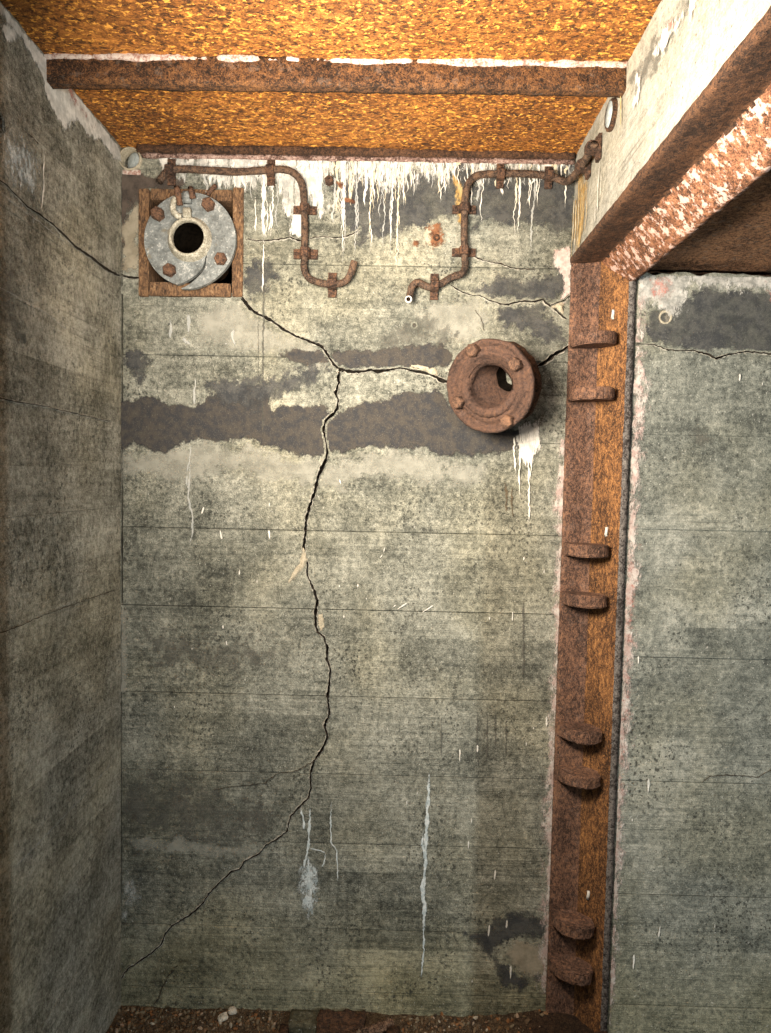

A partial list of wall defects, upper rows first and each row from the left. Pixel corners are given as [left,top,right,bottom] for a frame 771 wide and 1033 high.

leakage [121,153,575,540]
crack [451,285,570,367]
crack [636,343,771,360]
crack [121,296,447,1004]
leakage [299,802,338,918]
leakage [417,775,430,976]
leakage [463,439,564,993]
leakage [610,275,771,1005]